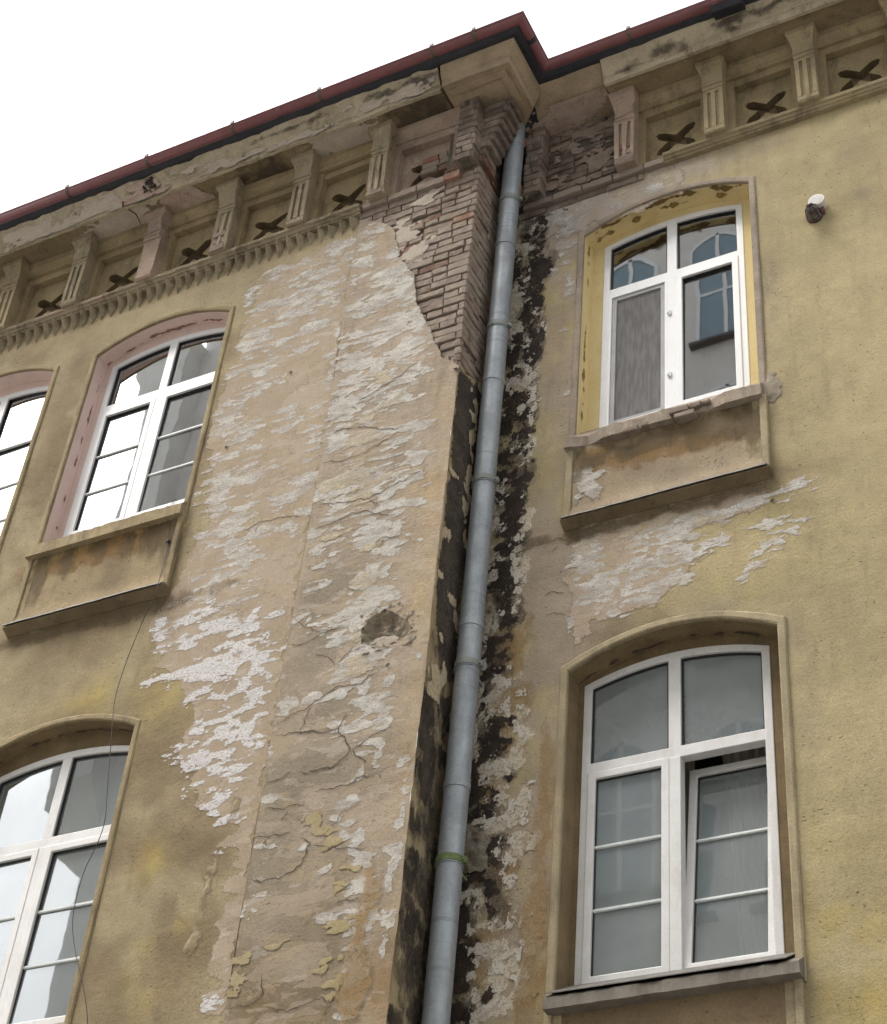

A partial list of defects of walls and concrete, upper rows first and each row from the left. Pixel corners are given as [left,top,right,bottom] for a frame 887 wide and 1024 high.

spalling [710,184,742,198]
crack [250,620,391,883]
crack [241,468,425,548]
crack [320,424,412,463]
peeling [148,88,696,1024]
water stain [387,371,481,1024]
water stain [450,208,568,1024]
water stain [563,483,763,543]
peeling [561,475,819,649]